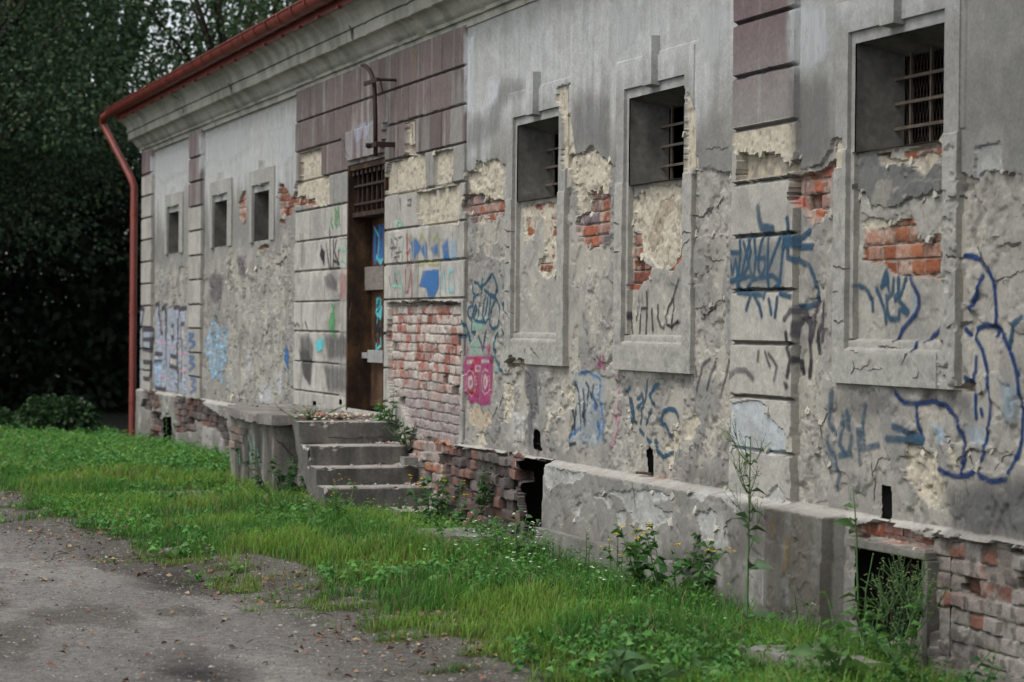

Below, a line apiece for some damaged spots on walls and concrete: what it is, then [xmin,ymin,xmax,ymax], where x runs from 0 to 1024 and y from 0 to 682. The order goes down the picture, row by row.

flaking render [276,183,316,225]
flaking render [460,159,505,223]
flaking render [557,82,612,251]
flaking render [629,182,682,290]
crack [682,197,724,319]
flaking render [682,92,943,278]
crack [850,345,947,378]
flaking render [142,390,248,448]
flaking render [387,300,586,544]
flaking render [729,399,835,505]
flaking render [595,485,739,539]
flaking render [859,519,1024,681]